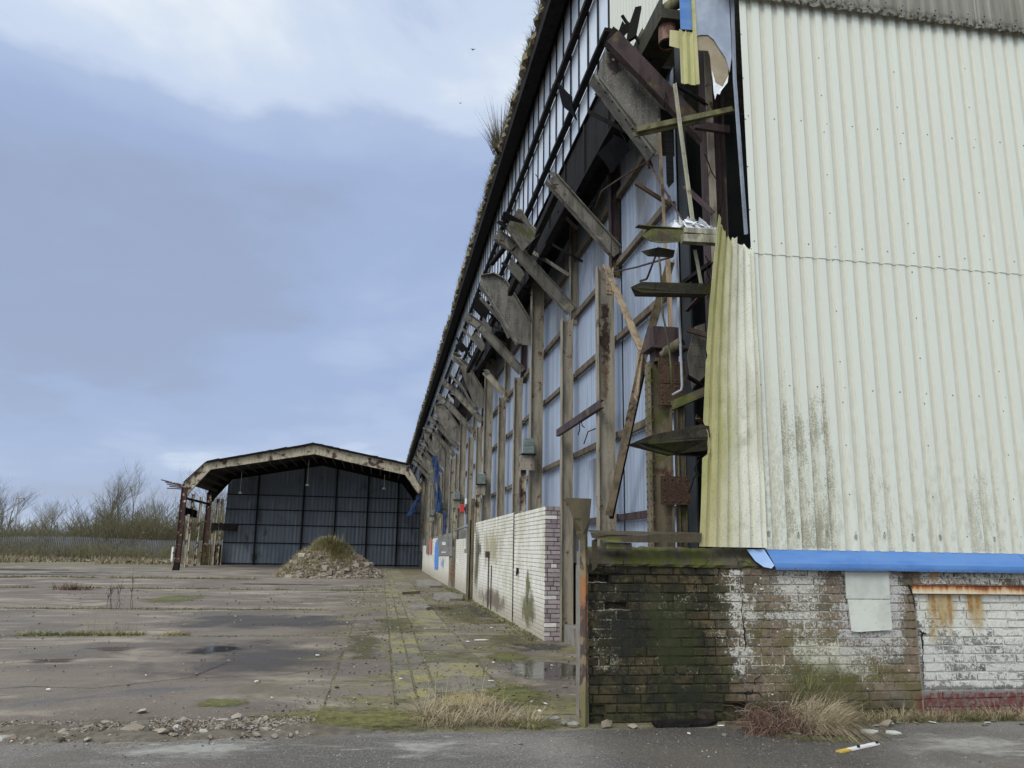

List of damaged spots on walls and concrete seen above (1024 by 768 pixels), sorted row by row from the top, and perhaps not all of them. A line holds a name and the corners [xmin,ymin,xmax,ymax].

damp [782,393,837,548]
damp [588,565,752,724]
crack [735,555,751,649]
peeling [588,569,1024,712]
crack [907,584,931,685]
rust [929,594,953,632]
rust [967,594,983,625]